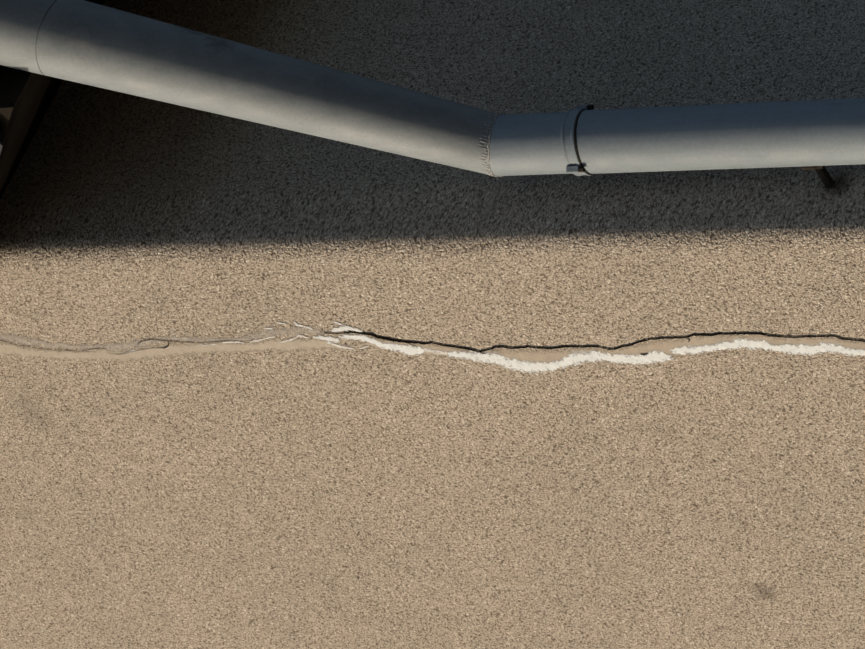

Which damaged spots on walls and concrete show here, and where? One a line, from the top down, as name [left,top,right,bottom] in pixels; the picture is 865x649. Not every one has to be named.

crack [0,339,250,355]
crack [321,331,865,355]
damp [343,335,865,373]